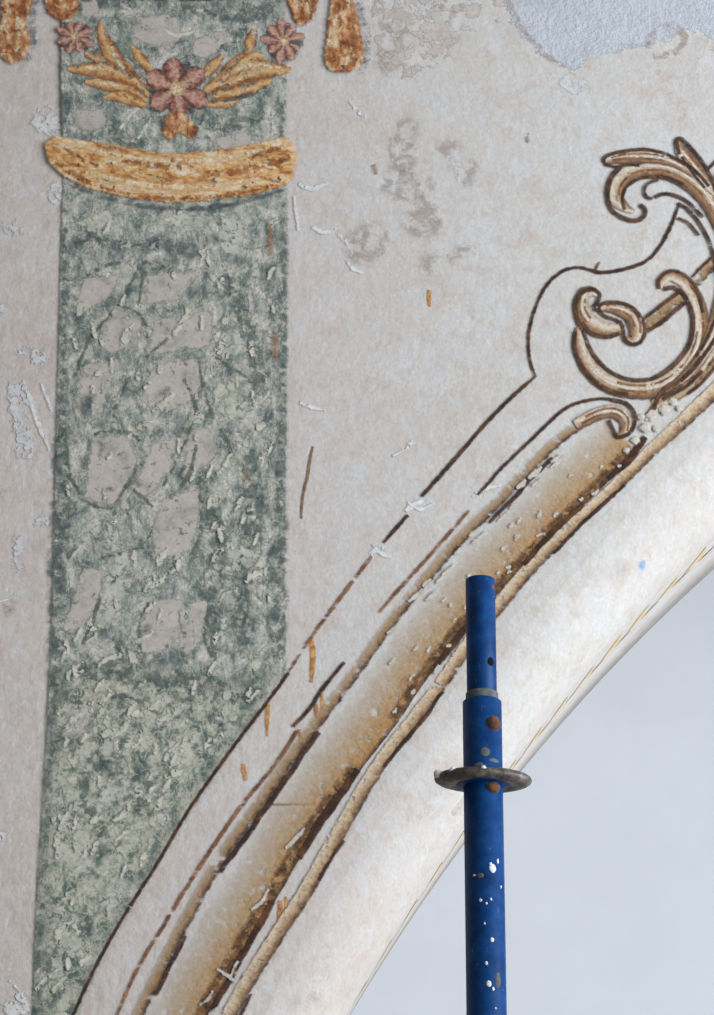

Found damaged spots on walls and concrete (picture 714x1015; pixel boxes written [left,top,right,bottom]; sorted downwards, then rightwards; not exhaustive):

peeling [505,0,714,95]